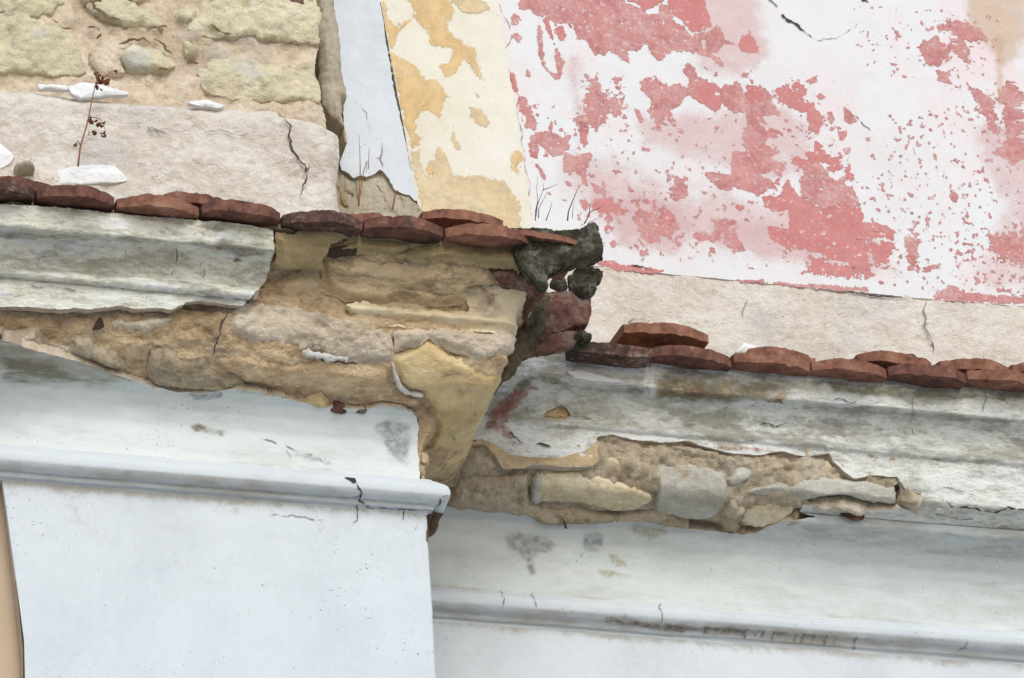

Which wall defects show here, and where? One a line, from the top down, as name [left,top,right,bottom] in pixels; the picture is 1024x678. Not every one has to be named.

crack [770,0,868,41]
crack [285,119,310,195]
peeling [335,0,521,228]
peeling [509,0,1024,304]
crack [850,291,935,352]
spalling [0,231,924,541]
crack [340,477,451,523]